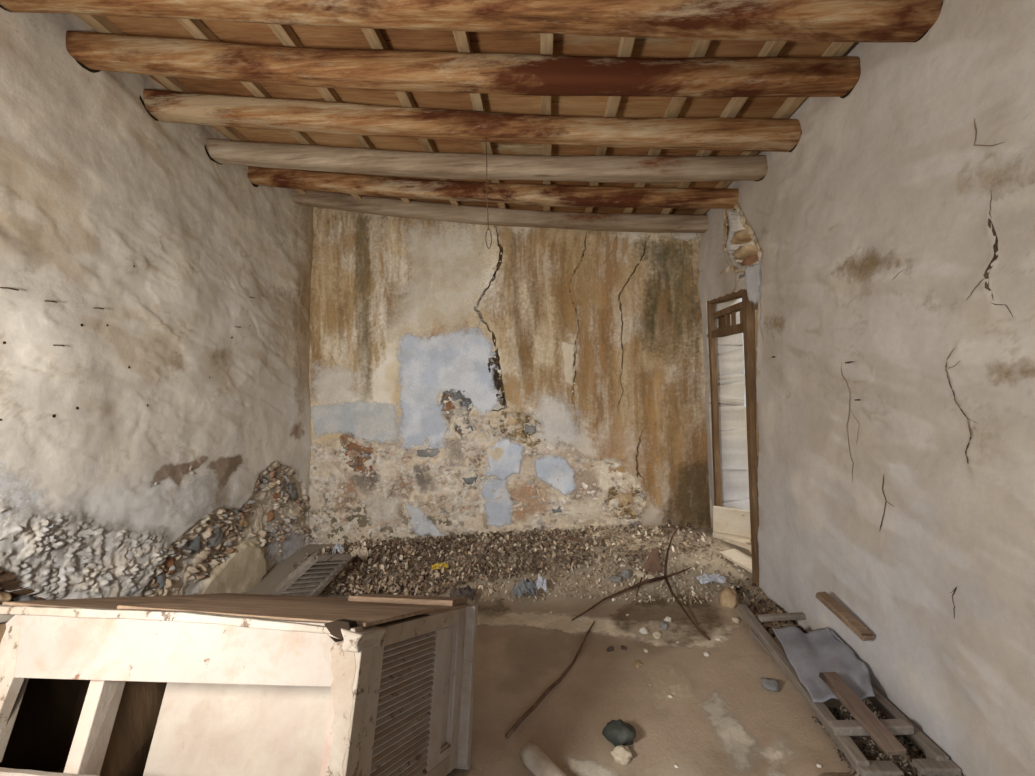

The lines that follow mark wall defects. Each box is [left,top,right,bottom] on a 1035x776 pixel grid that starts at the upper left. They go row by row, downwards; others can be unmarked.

crack [973,118,1005,146]
flaking render [0,389,647,605]
water stain [300,214,411,396]
crack [474,226,507,411]
crack [569,235,617,431]
water stain [493,230,711,528]
crack [614,236,650,418]
crack [841,365,859,482]
crack [880,476,893,529]
crack [945,350,976,463]
crack [966,190,1013,317]